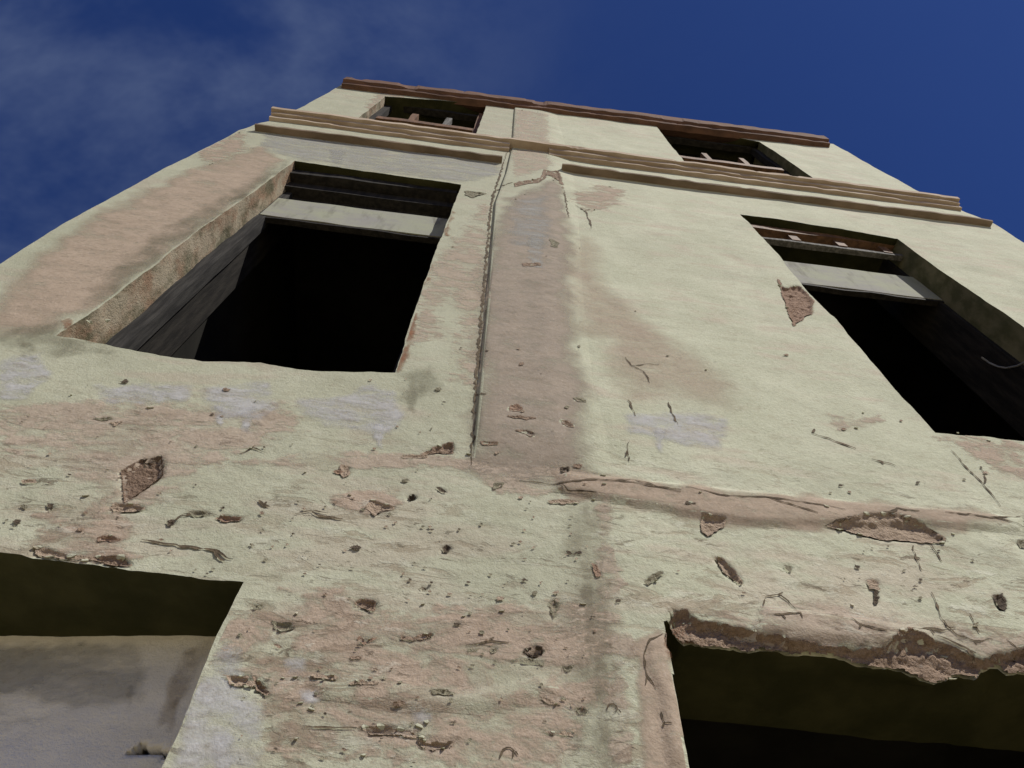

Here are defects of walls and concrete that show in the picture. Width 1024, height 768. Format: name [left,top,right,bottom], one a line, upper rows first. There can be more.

crack [470,152,513,465]
peeling [401,110,1004,552]
peeling [0,394,301,567]
crack [141,513,231,561]
crack [519,451,1022,570]
crack [644,633,663,688]
spalling [633,599,1024,768]